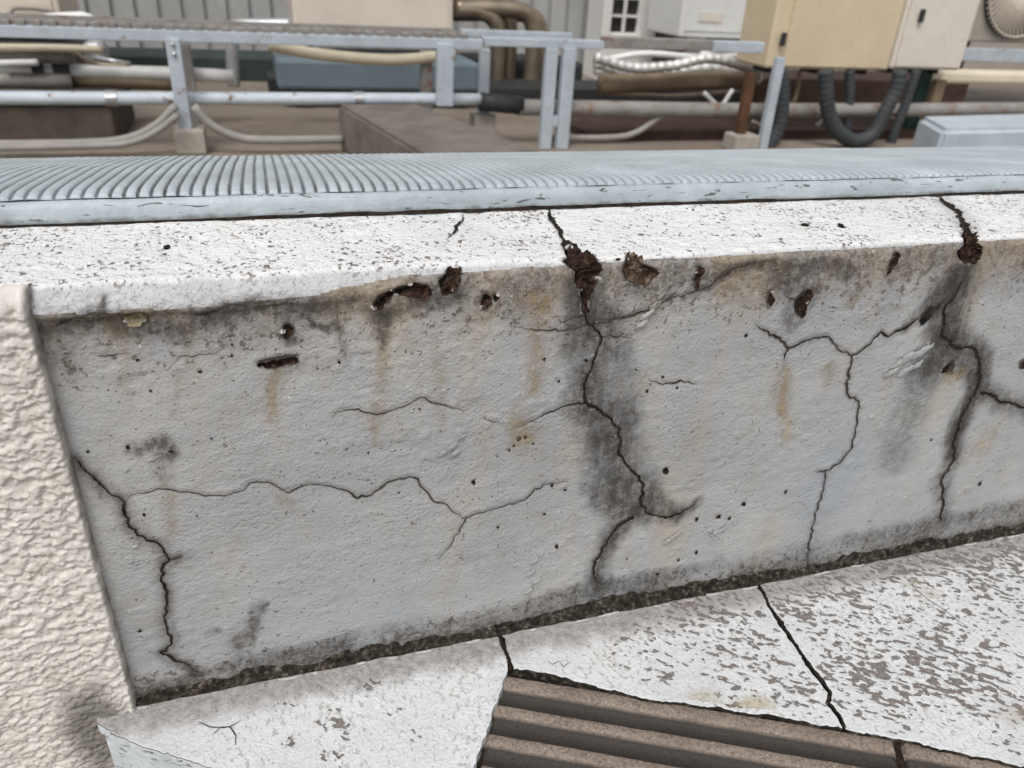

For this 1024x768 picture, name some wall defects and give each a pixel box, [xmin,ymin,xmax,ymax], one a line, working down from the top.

crack [448,214,464,237]
crack [547,209,581,256]
spalling [559,243,603,312]
spalling [624,251,660,285]
crack [938,196,971,232]
spalling [957,228,983,264]
crack [333,261,769,586]
leakage [566,271,695,595]
crack [757,276,1024,559]
leakage [920,264,989,458]
crack [73,457,569,673]
crack [758,585,846,728]